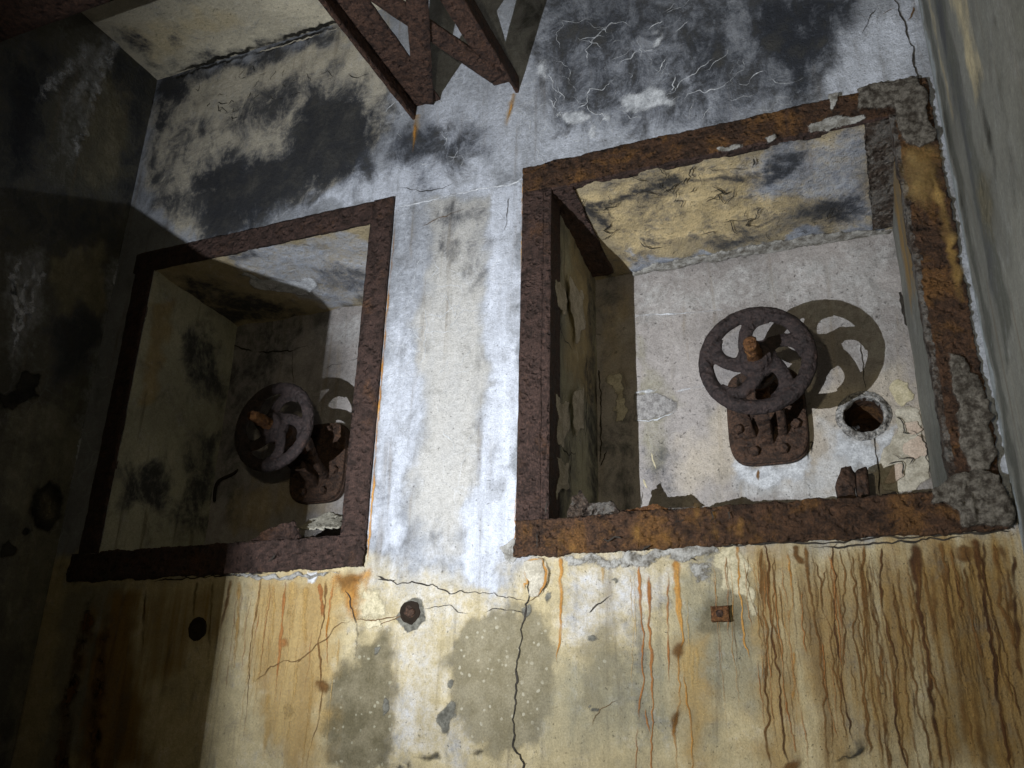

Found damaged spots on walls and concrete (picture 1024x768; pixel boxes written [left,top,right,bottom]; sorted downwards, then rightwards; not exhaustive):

crack [175,21,340,104]
spalling [808,76,937,147]
crack [862,0,919,77]
flaking render [556,388,584,499]
flaking render [879,353,1016,527]
rust [208,572,370,757]
damp [321,630,397,768]
crack [378,503,547,768]
damp [446,604,553,757]
rust [635,568,654,768]
rust [666,561,706,768]
rust [714,540,1024,768]